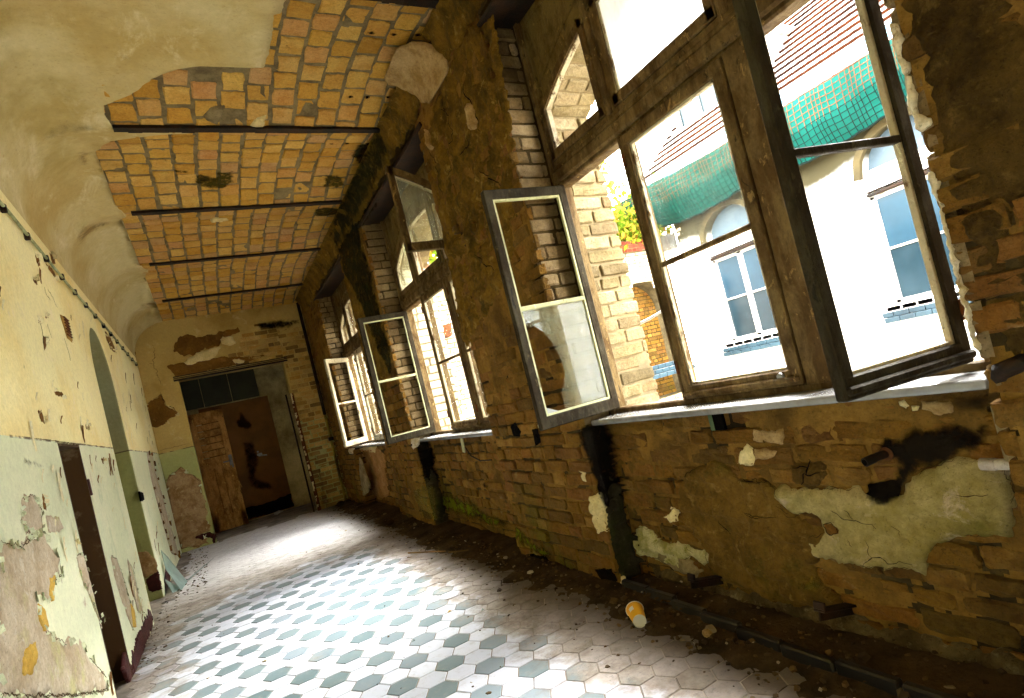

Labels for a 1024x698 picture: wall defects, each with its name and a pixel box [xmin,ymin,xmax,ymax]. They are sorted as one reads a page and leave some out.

water stain [174,170,233,188]
flaking render [96,0,433,321]
spalling [901,0,1024,355]
spalling [37,312,50,350]
peeling [105,331,117,353]
spalling [167,327,268,376]
spalling [338,228,389,398]
spalling [147,394,179,429]
peeling [899,400,954,415]
spalling [138,451,211,558]
peeling [664,428,843,607]
peeling [0,494,111,698]